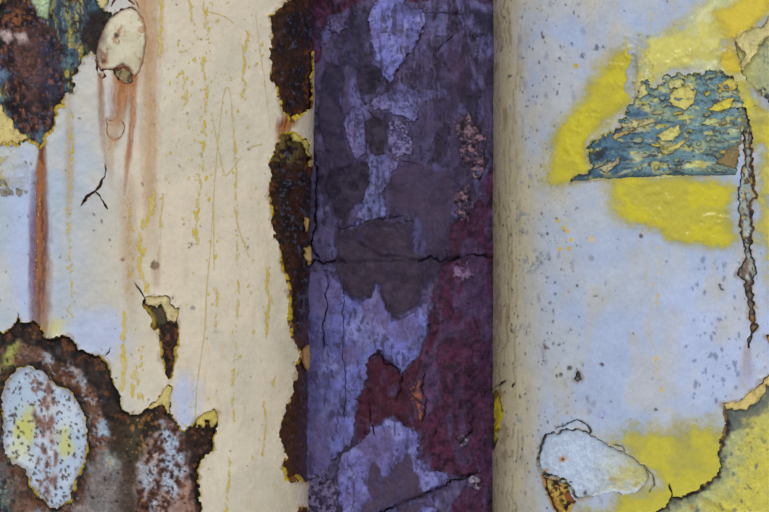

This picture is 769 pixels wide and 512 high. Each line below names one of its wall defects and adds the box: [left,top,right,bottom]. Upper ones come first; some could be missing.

peeling [0,0,112,149]
corrosion [114,74,137,165]
corrosion [139,0,154,101]
corrosion [277,116,297,135]
peeling [570,16,769,182]
crack [310,154,375,434]
peeling [268,0,449,512]
crack [338,215,411,230]
crack [420,253,493,263]
peeling [0,295,218,512]
crack [381,473,475,512]
peeling [656,375,769,512]